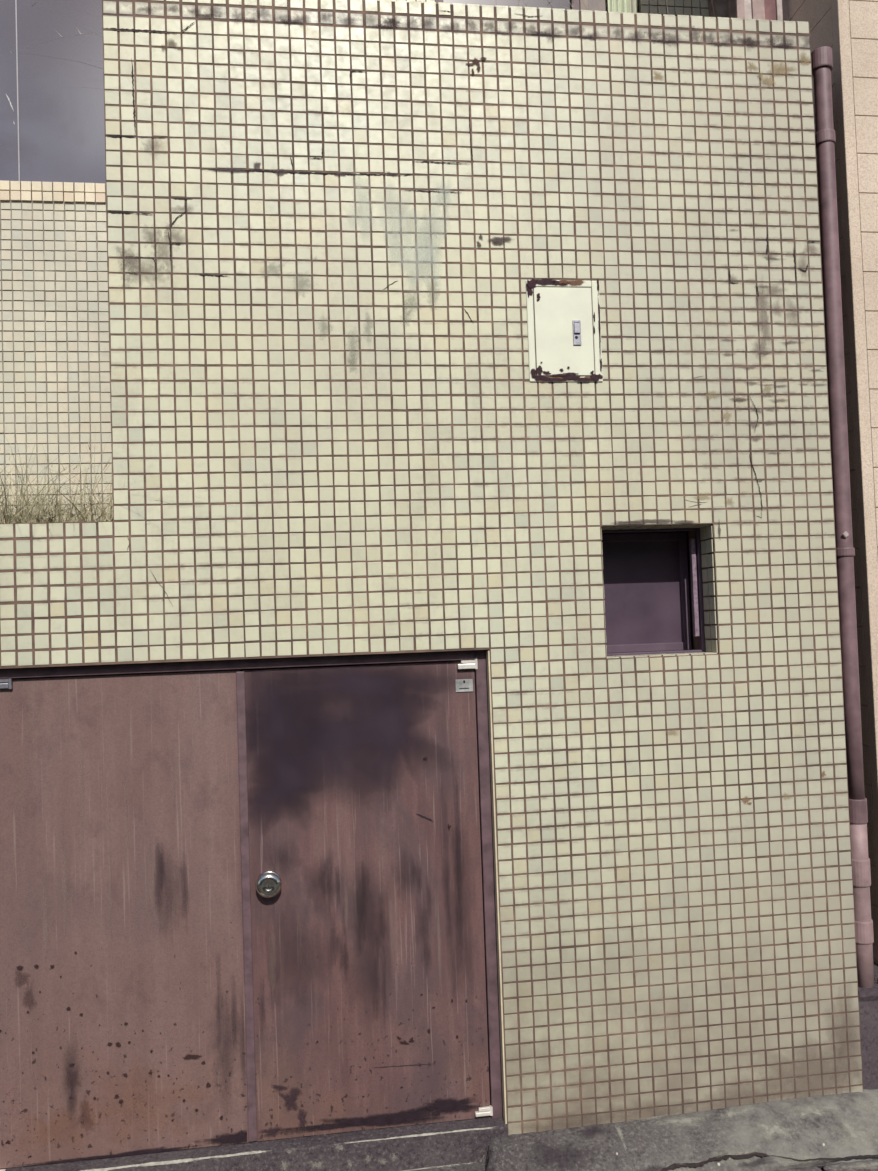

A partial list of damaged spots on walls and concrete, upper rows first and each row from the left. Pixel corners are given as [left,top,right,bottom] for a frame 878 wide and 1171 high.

rust [532,279,602,382]
crack [660,1152,878,1171]